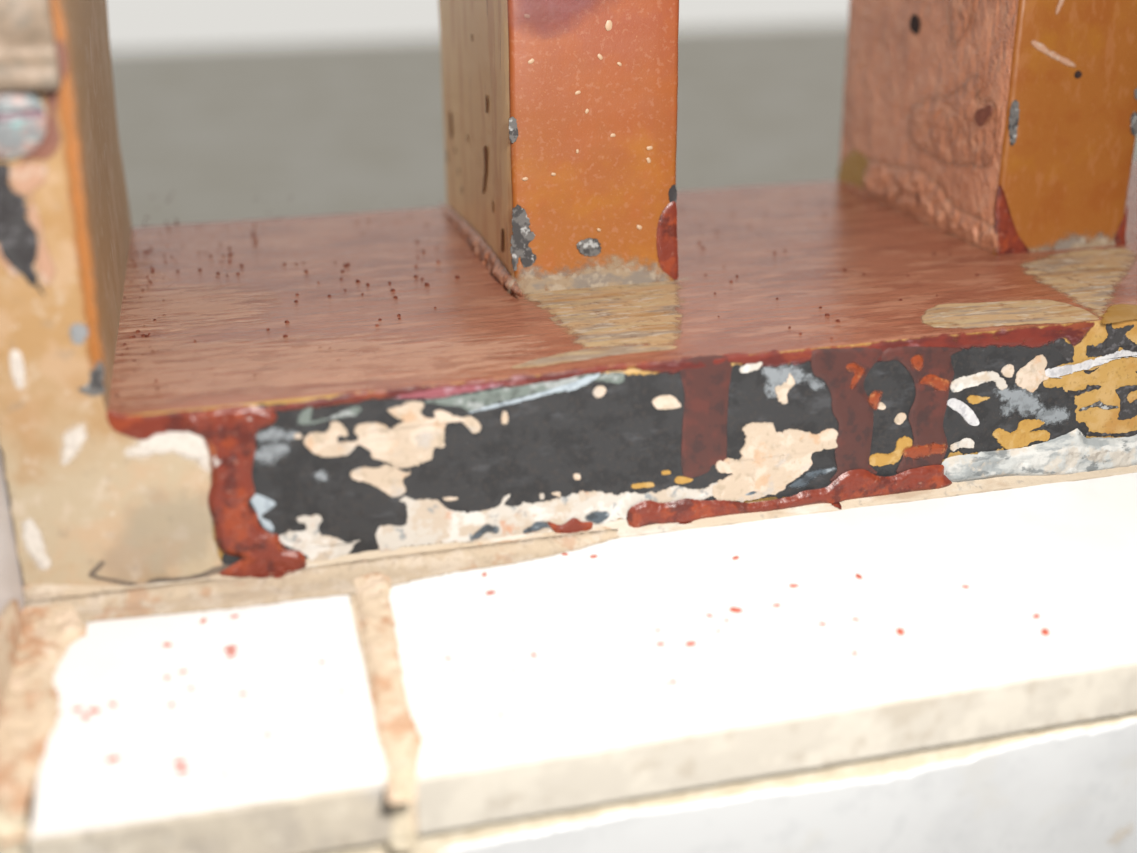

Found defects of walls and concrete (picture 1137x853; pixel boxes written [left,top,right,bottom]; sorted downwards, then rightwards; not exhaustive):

spalling [0,163,55,296]
peeling [248,360,839,561]
peeling [511,345,677,368]
peeling [863,360,916,477]
peeling [922,300,1137,459]
peeling [222,553,241,568]